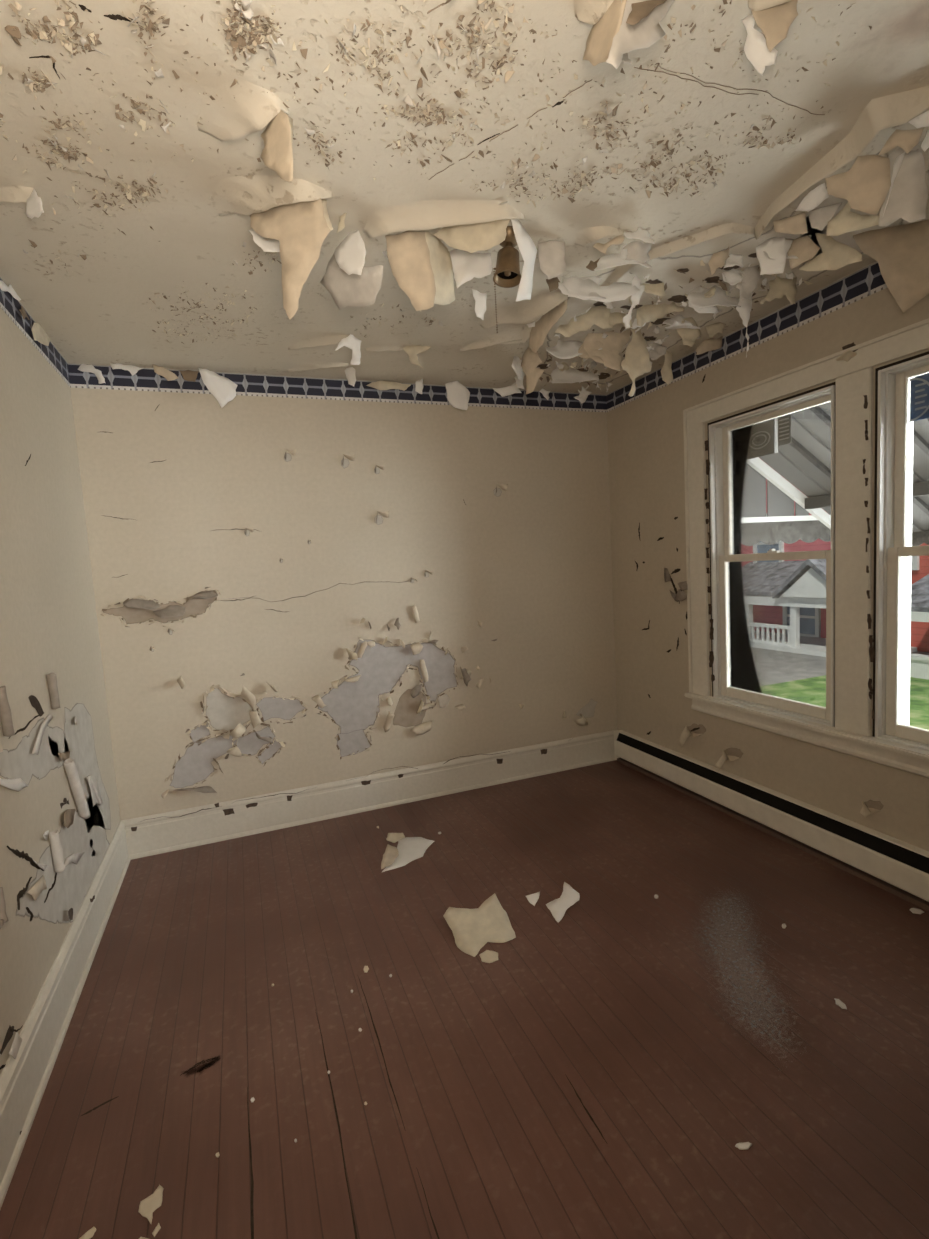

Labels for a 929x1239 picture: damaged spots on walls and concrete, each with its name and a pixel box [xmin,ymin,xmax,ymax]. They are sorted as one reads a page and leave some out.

peeling [0,673,110,929]
peeling [100,582,363,635]
peeling [161,605,491,815]